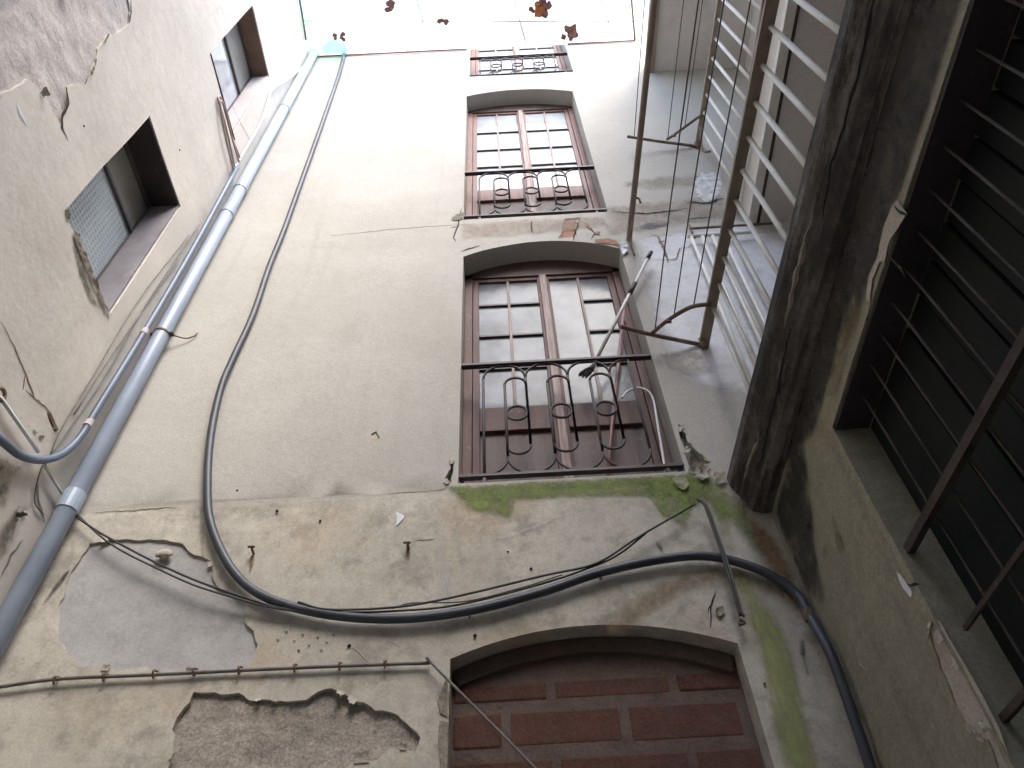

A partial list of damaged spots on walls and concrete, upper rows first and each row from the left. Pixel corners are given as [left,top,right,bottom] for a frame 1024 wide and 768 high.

peeling [0,0,129,120]
flaking render [65,209,112,316]
crack [743,0,875,487]
leakage [778,0,959,597]
crack [2,323,56,427]
flaking render [672,425,711,489]
peeling [59,538,258,672]
peeling [169,689,420,768]
peeling [926,620,1009,768]